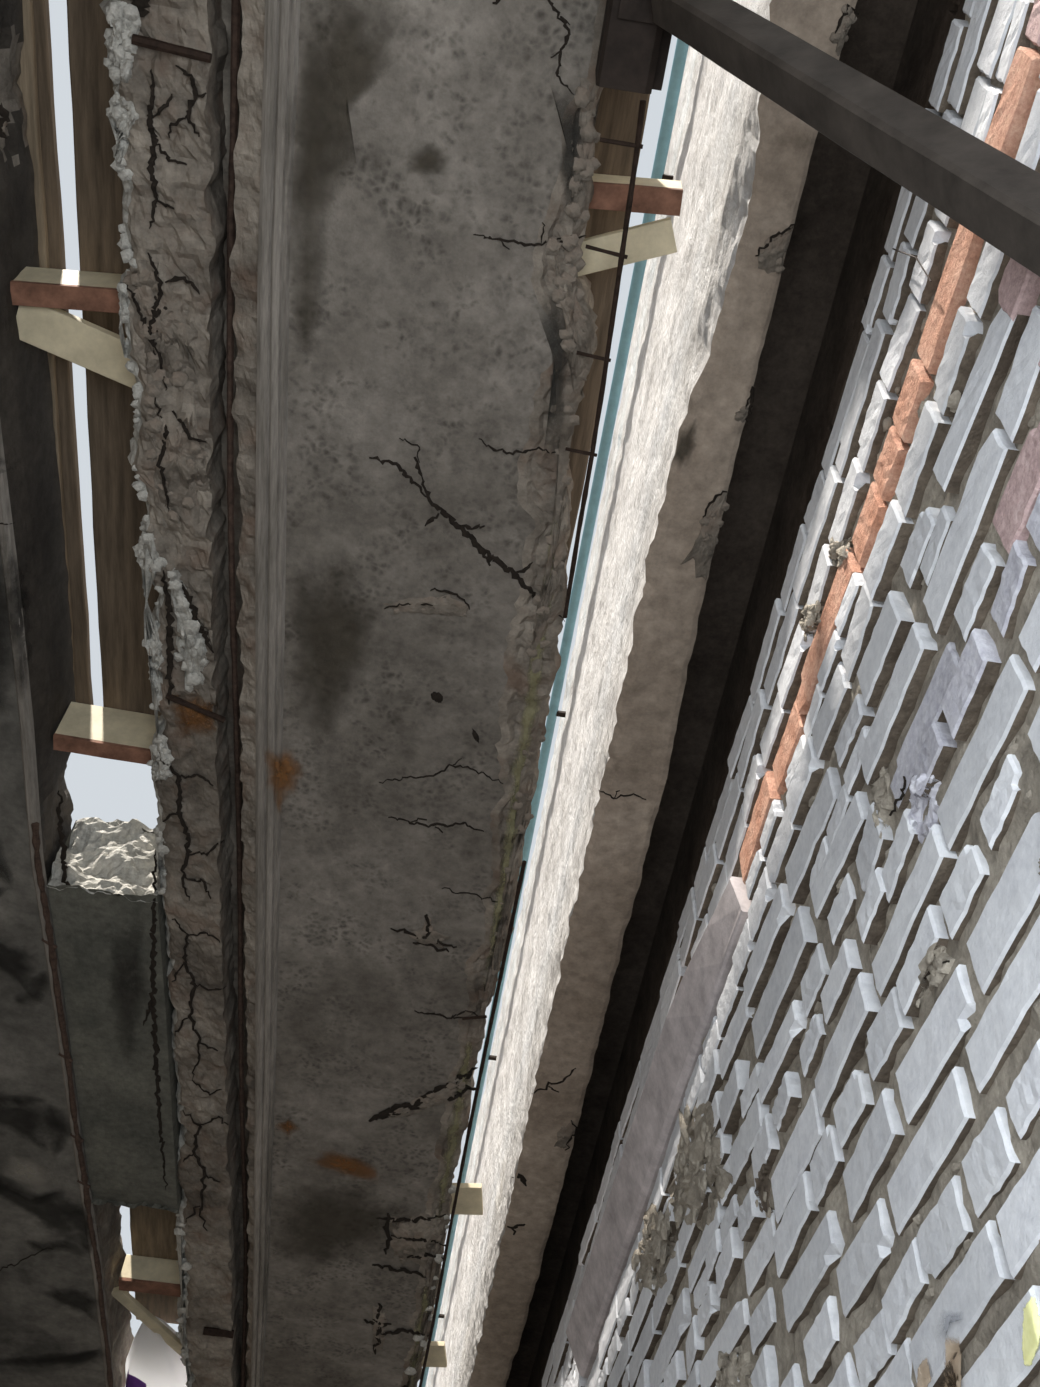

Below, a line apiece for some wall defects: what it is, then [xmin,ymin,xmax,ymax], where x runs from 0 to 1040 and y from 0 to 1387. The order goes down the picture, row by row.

crack [548,0,574,95]
crack [146,65,206,229]
crack [148,296,168,355]
crack [369,438,565,622]
spalling [103,0,248,1387]
crack [143,752,229,1231]
spalling [31,790,113,1387]